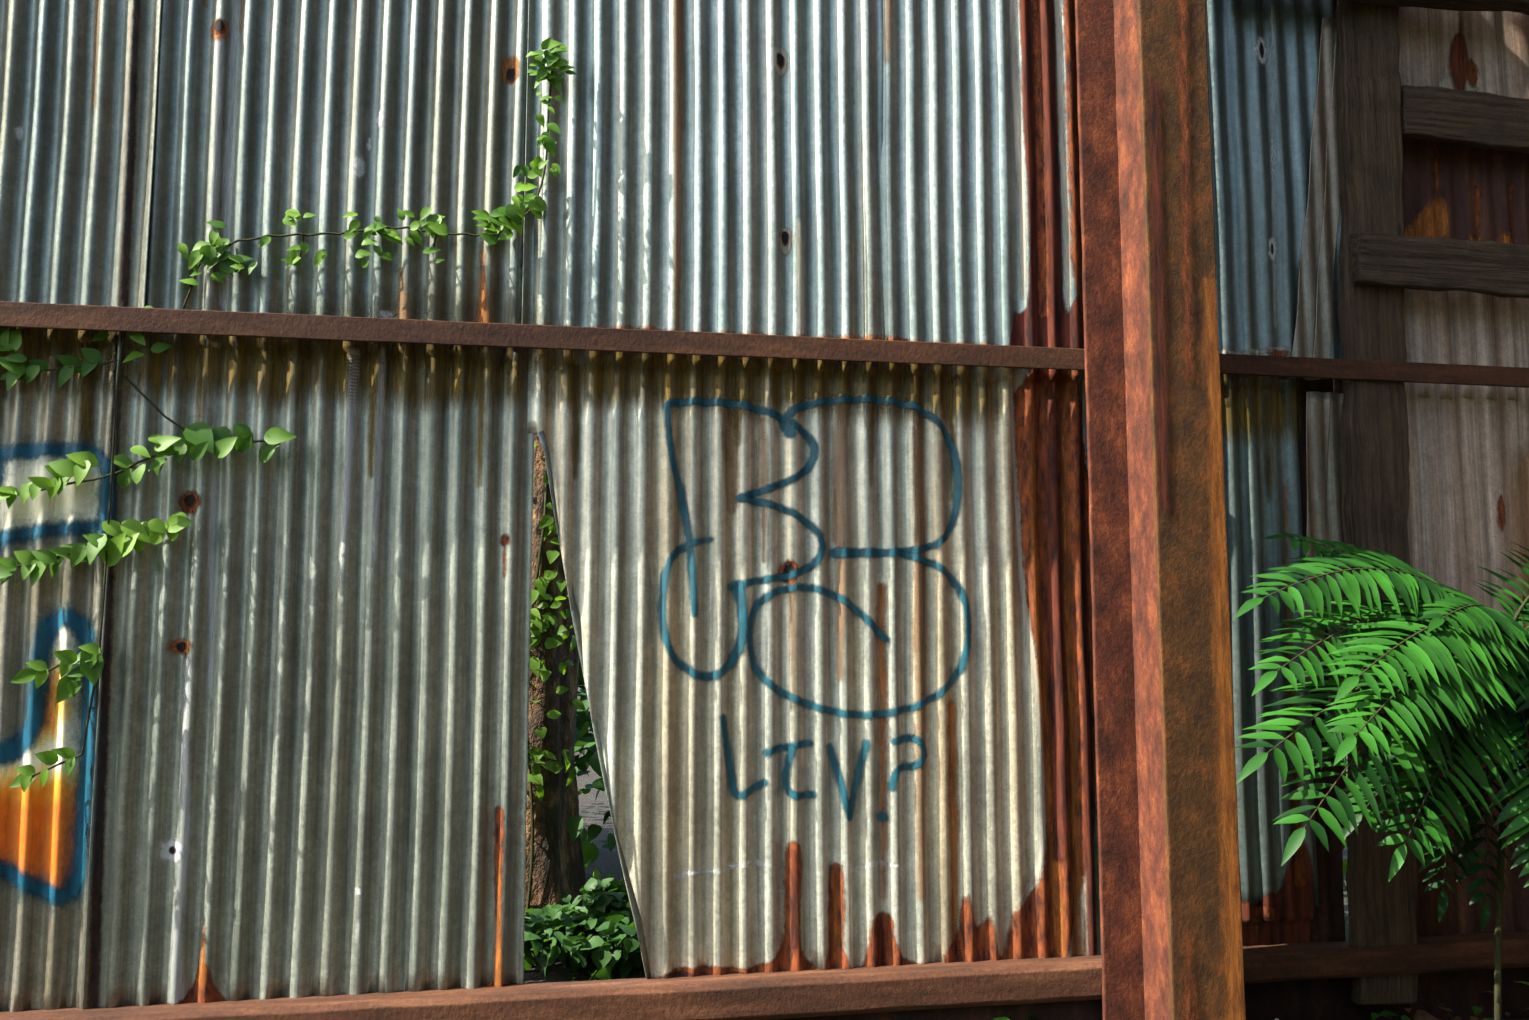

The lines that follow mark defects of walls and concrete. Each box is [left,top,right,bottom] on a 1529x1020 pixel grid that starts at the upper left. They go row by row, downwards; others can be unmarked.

rust [1009,0,1084,349]
rust [485,806,517,987]
rust [660,584,913,979]
rust [833,402,845,680]
rust [915,403,926,899]
rust [943,369,1097,963]